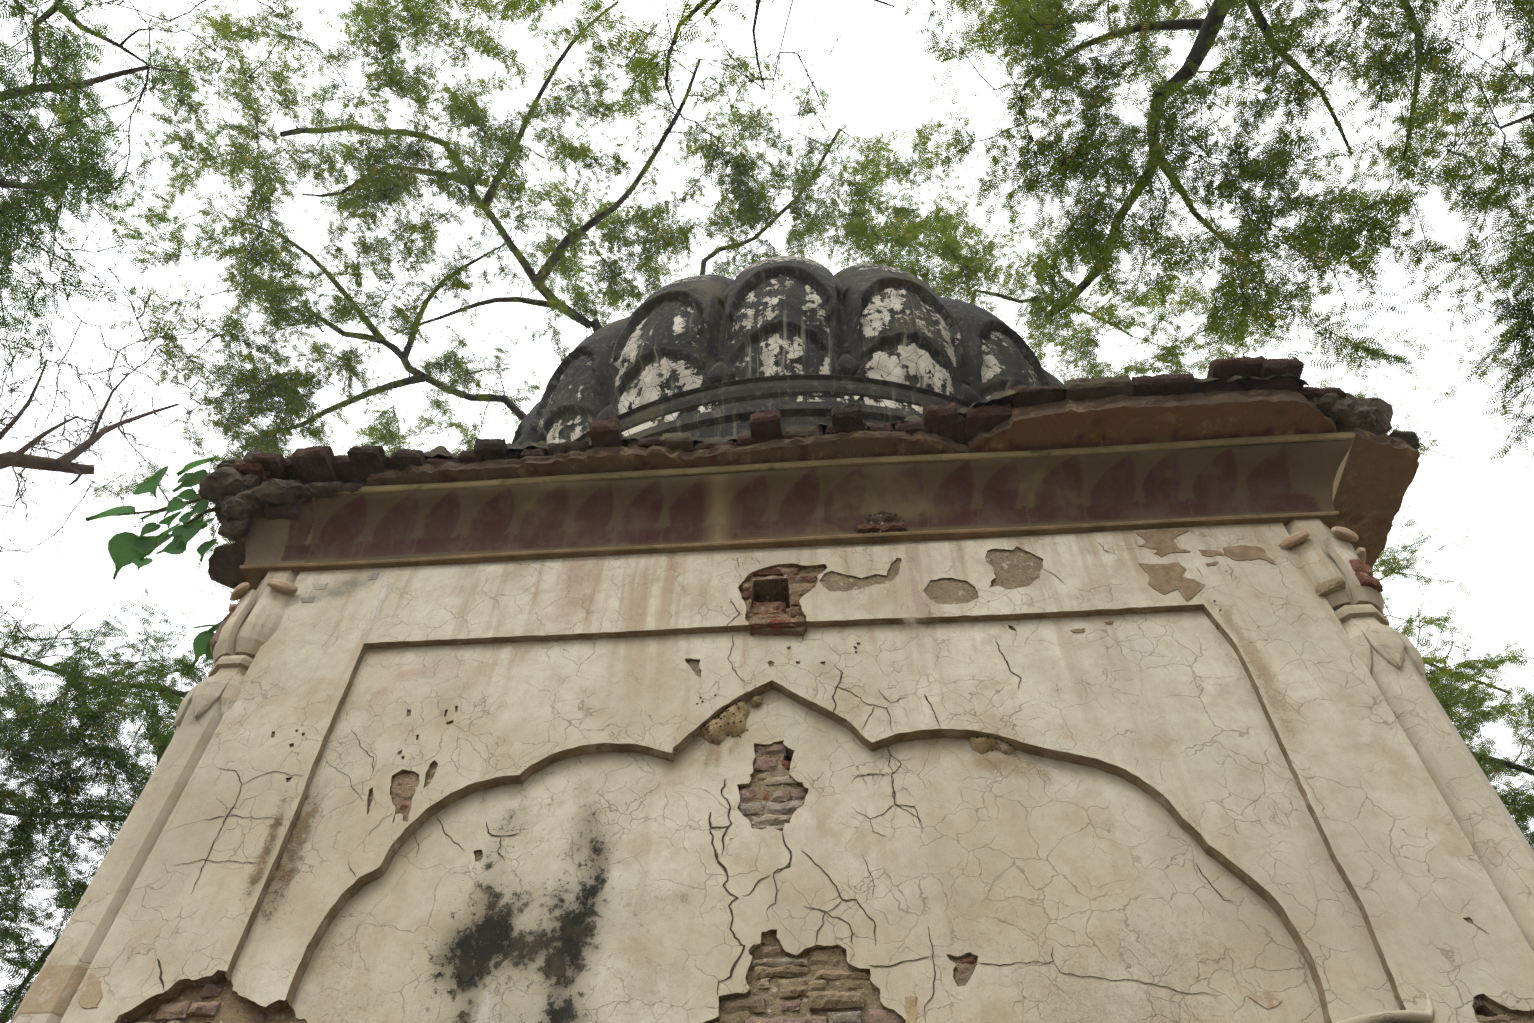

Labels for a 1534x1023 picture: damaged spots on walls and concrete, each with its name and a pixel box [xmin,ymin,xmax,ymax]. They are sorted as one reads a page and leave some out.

peeling [726,256,961,396]
spalling [1327,392,1420,450]
spalling [738,558,902,665]
crack [996,642,1022,689]
crack [178,731,521,895]
spalling [737,740,808,832]
crack [708,665,941,1023]
damp [429,804,611,1023]
crack [156,959,164,990]
spalling [114,970,307,1023]
spalling [703,929,917,1023]
crack [981,949,1222,996]